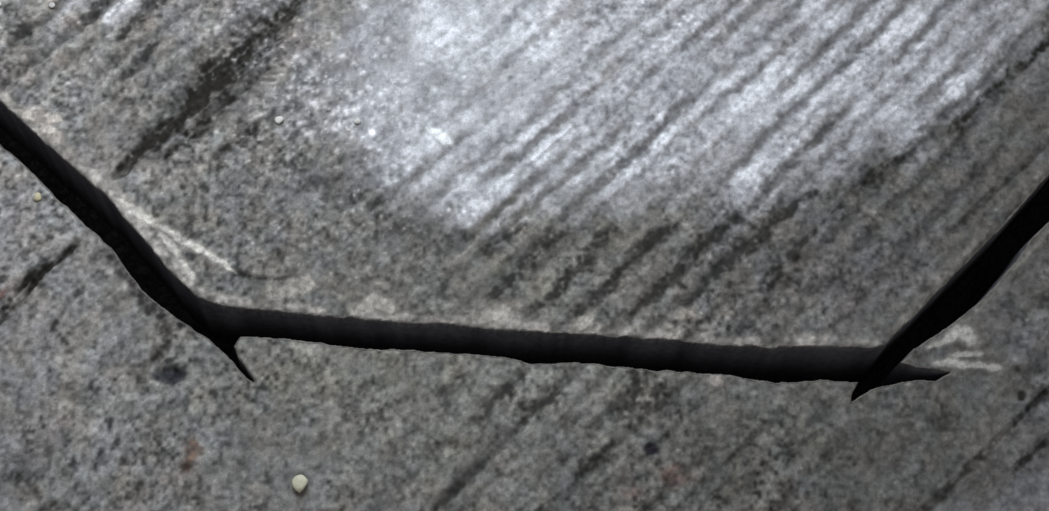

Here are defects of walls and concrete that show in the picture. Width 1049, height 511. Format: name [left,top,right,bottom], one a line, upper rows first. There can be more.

crack [117,0,304,177]
crack [954,40,1049,130]
crack [860,156,905,185]
crack [0,244,78,324]
crack [1013,389,1048,426]
crack [923,454,983,511]
crack [1015,439,1046,470]